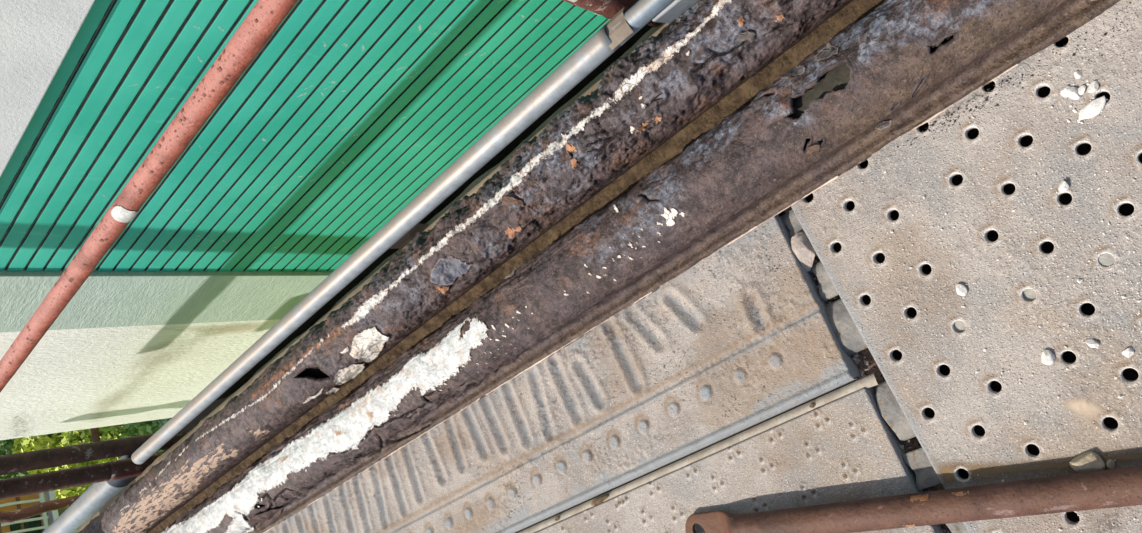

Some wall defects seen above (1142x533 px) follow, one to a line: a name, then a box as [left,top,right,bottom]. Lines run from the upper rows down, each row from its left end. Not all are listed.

rust [193,50,234,102]
rust [560,142,579,168]
rust [505,226,522,239]
peeling [303,0,732,404]
rust [725,176,838,247]
peeling [113,306,533,533]
rust [369,320,607,468]
rust [940,460,1072,496]
rust [1101,452,1142,465]
rust [248,498,320,533]